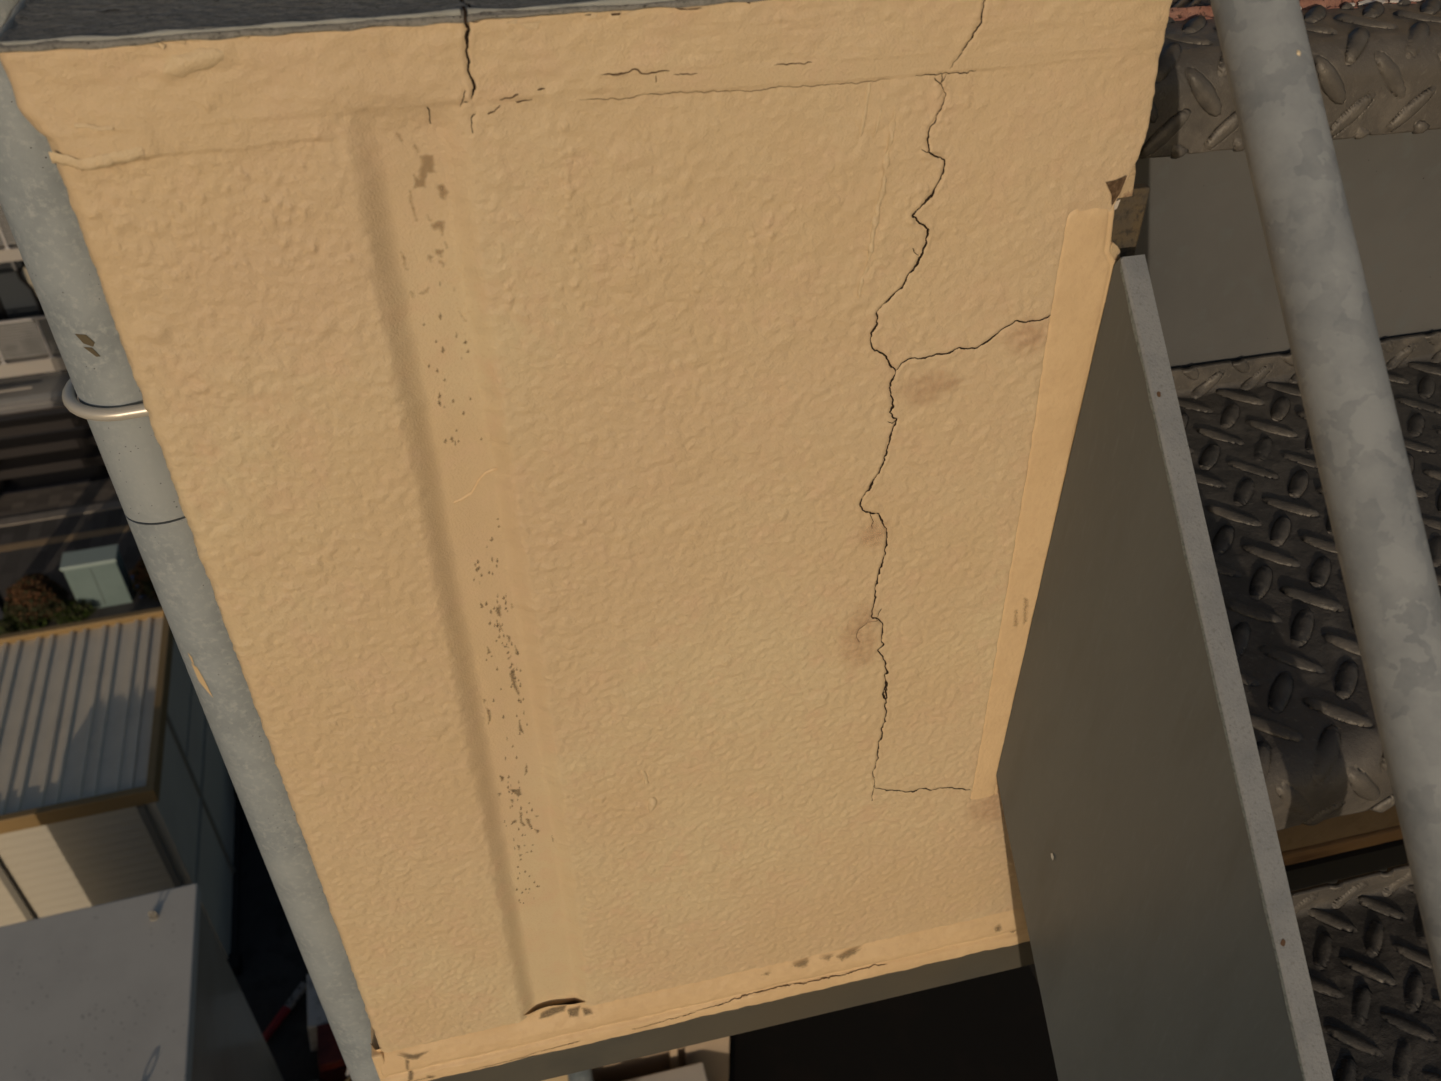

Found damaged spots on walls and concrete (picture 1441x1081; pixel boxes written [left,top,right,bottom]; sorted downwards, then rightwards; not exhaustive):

crack [427,0,545,133]
crack [584,62,881,100]
crack [856,0,1050,800]